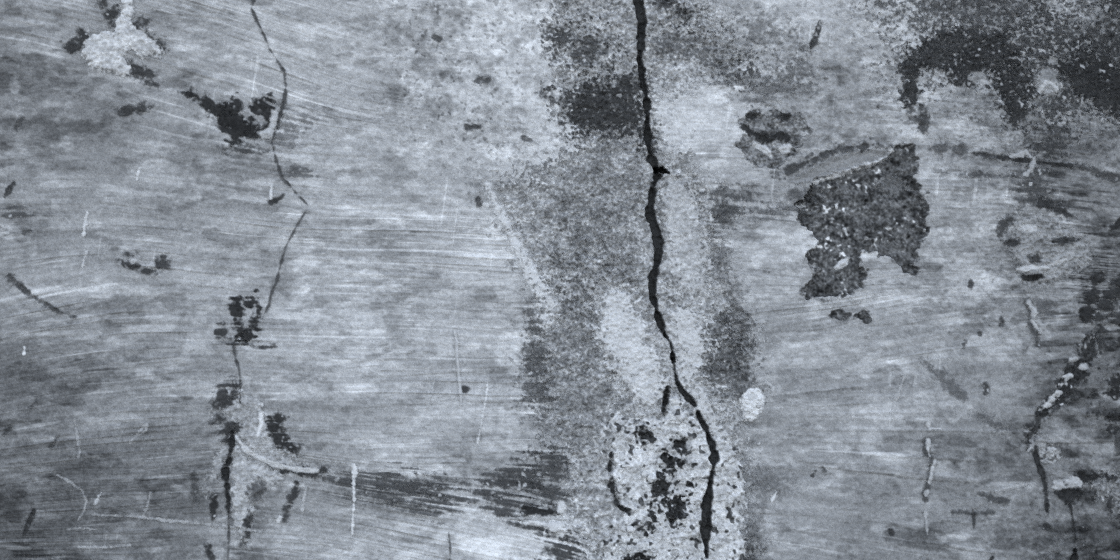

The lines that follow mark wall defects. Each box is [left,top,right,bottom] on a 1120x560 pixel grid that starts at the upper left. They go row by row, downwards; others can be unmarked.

damp [878,0,1120,139]
crack [251,0,307,319]
crack [633,0,720,558]
spalling [735,107,930,324]
damp [973,152,1120,182]
crack [232,343,241,403]
crack [221,430,235,558]
crack [606,452,631,516]